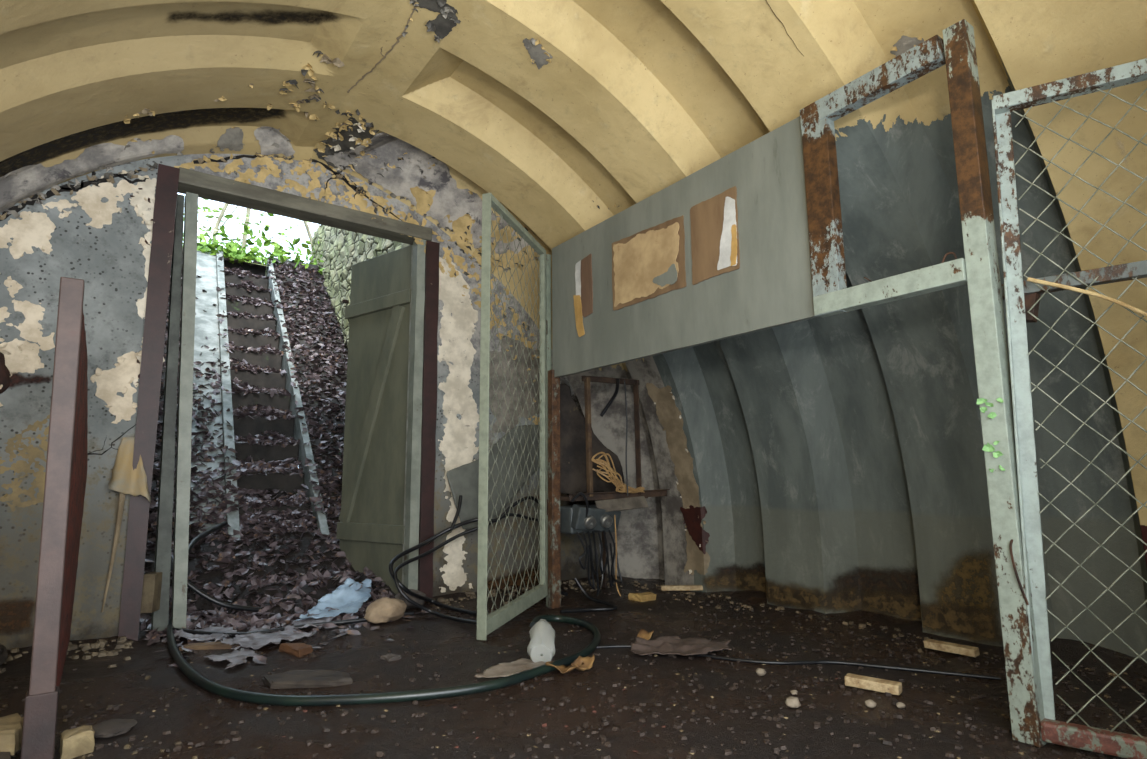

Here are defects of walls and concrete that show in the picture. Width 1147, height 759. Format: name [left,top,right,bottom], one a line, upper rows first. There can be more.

crack [347,2,419,93]
peeling [410,0,461,43]
peeling [522,38,553,70]
peeling [0,50,540,612]
damp [704,553,1003,644]